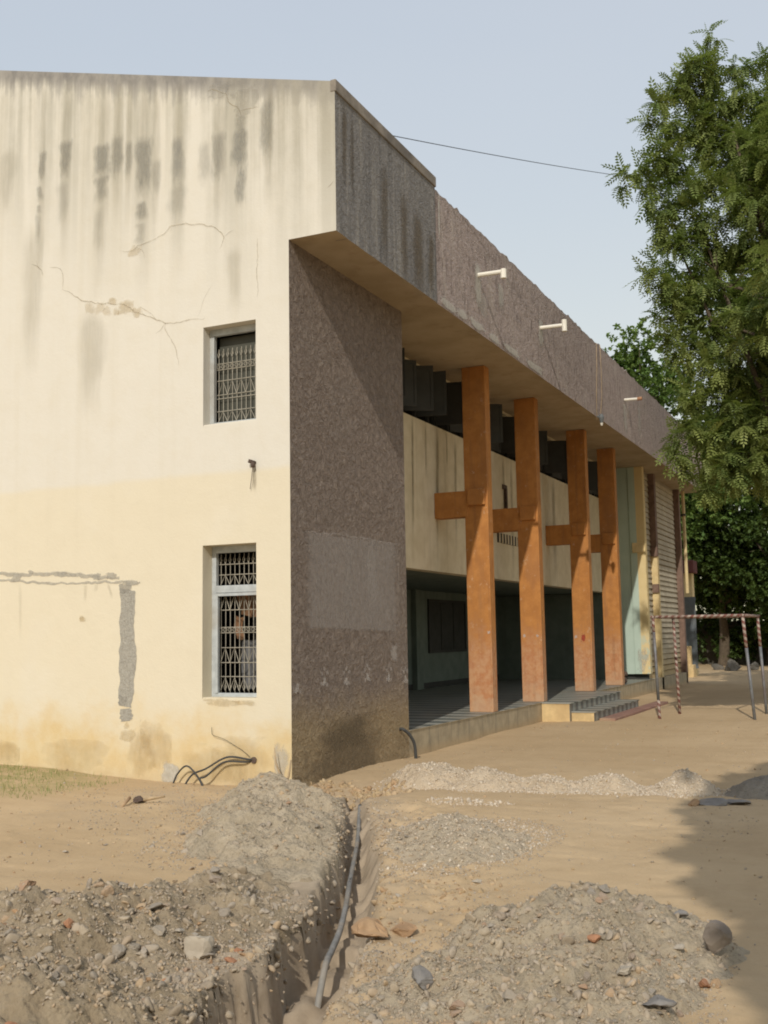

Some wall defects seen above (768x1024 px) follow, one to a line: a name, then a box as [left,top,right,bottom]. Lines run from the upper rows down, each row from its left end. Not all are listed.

damp [97,143,120,169]
damp [235,130,245,191]
spalling [0,570,140,594]
peeling [118,695,133,722]